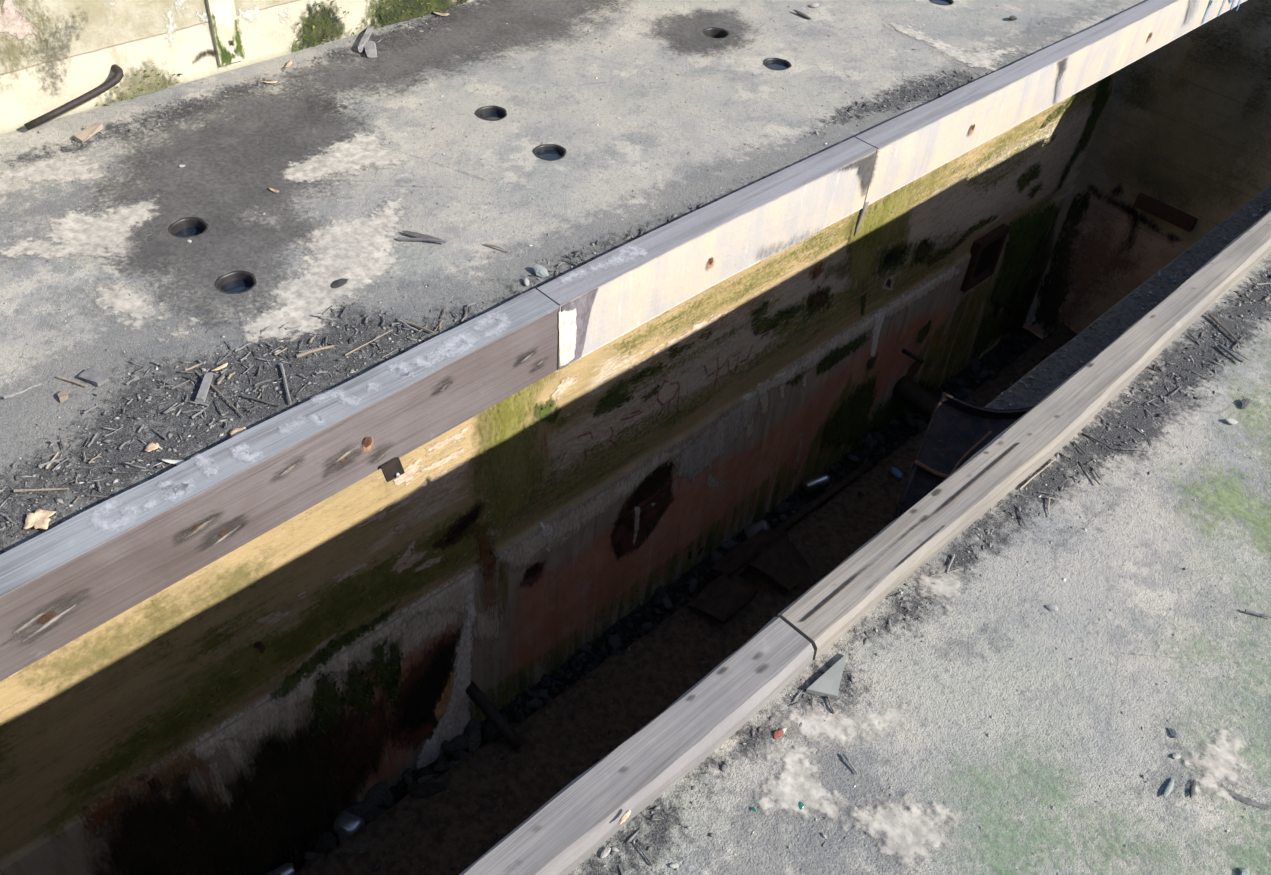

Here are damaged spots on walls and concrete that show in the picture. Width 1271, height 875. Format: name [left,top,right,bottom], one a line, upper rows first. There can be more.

damp [647,9,751,56]
damp [971,184,1179,359]
damp [475,266,961,571]
spalling [611,460,675,559]
damp [92,568,504,875]